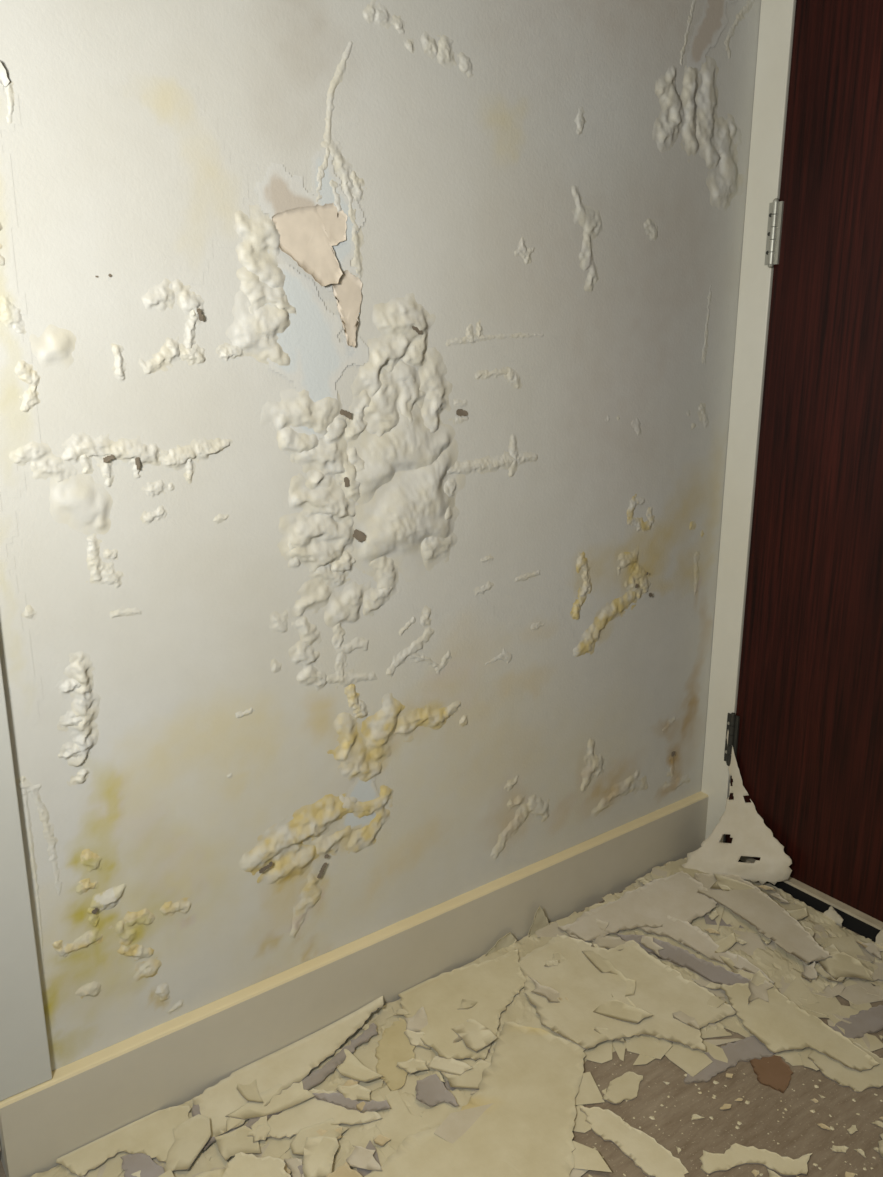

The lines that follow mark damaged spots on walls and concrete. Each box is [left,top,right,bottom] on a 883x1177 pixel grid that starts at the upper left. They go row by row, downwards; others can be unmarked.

peeling [254,139,369,402]
leakage [28,0,747,1071]